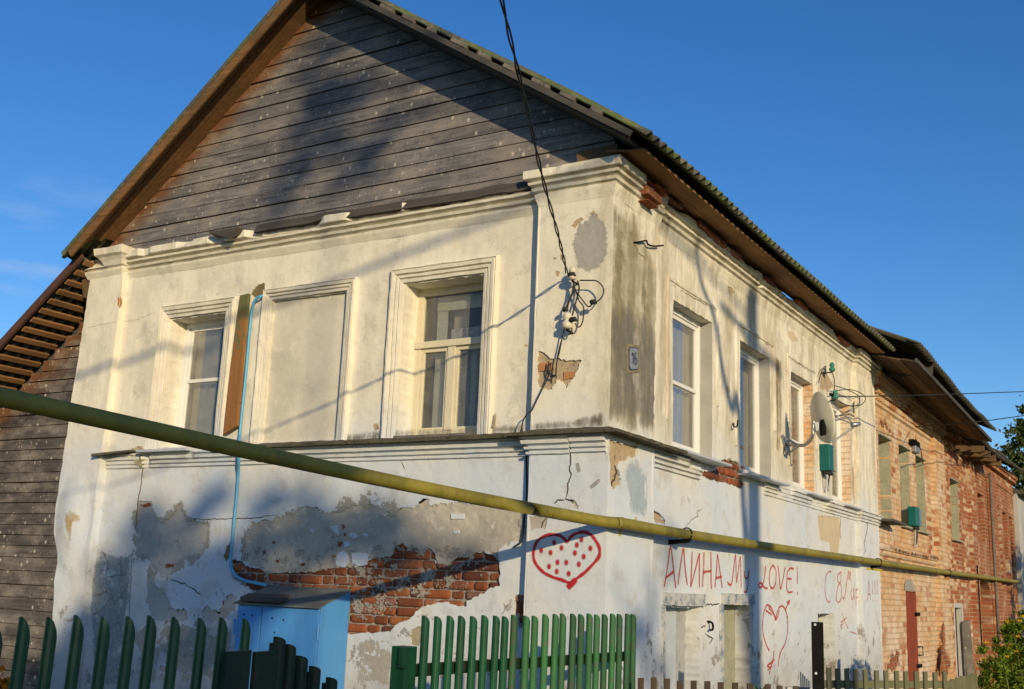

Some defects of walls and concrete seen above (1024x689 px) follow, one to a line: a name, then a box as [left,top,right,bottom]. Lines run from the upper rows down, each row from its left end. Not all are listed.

spalling [638,178,683,210]
peeling [553,210,607,277]
spalling [696,221,742,260]
damp [577,212,655,427]
flaking render [524,344,582,390]
crack [135,468,144,527]
crack [554,443,573,504]
flaking render [590,440,664,524]
flaking render [700,459,745,489]
peeling [129,500,238,682]
peeling [224,490,548,686]